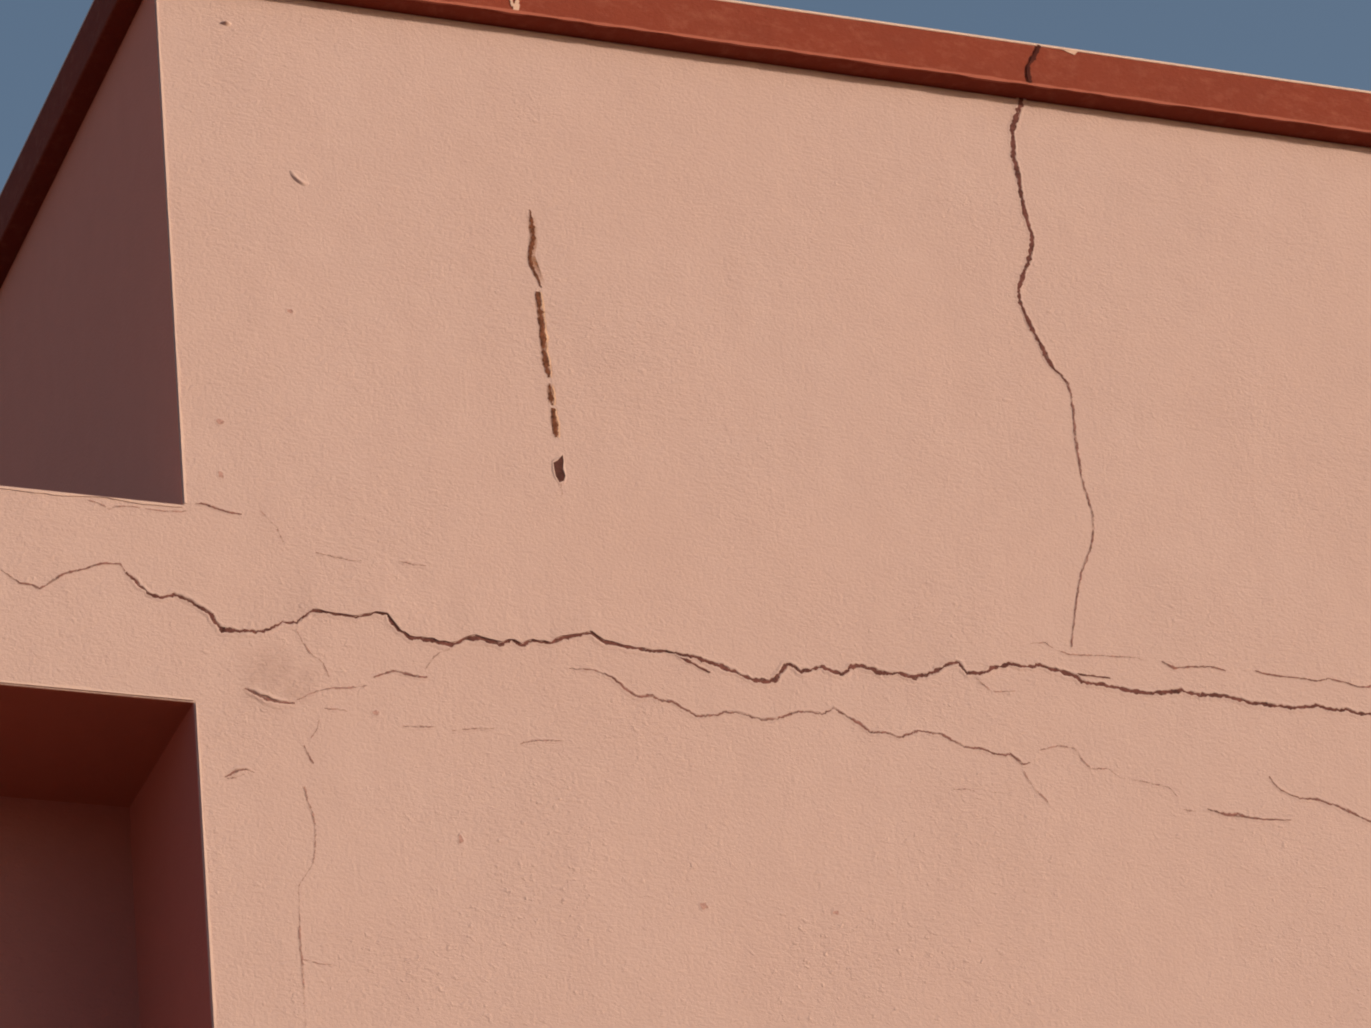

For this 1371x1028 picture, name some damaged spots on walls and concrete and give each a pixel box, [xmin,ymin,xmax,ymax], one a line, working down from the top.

crack [1,45,1371,826]
crack [298,722,331,987]